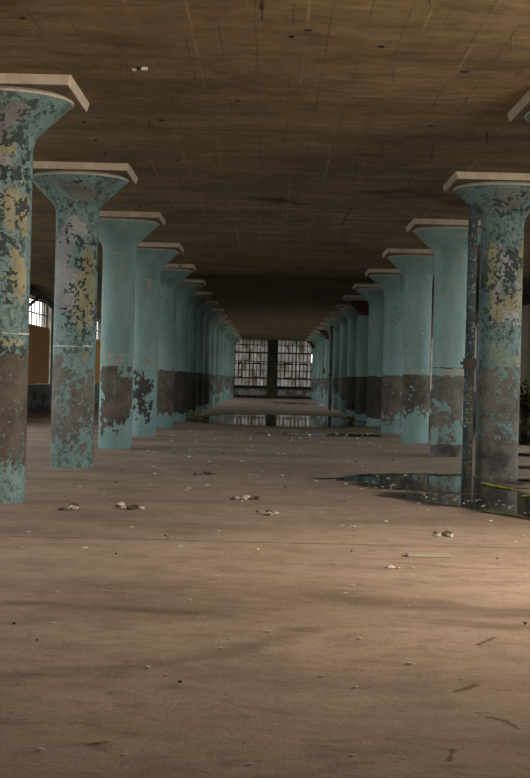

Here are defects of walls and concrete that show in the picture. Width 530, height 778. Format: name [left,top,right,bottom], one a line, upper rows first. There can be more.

peeling [0,98,56,305]
peeling [0,179,266,475]
peeling [479,191,530,340]
peeling [277,367,464,457]
peeling [474,343,521,479]